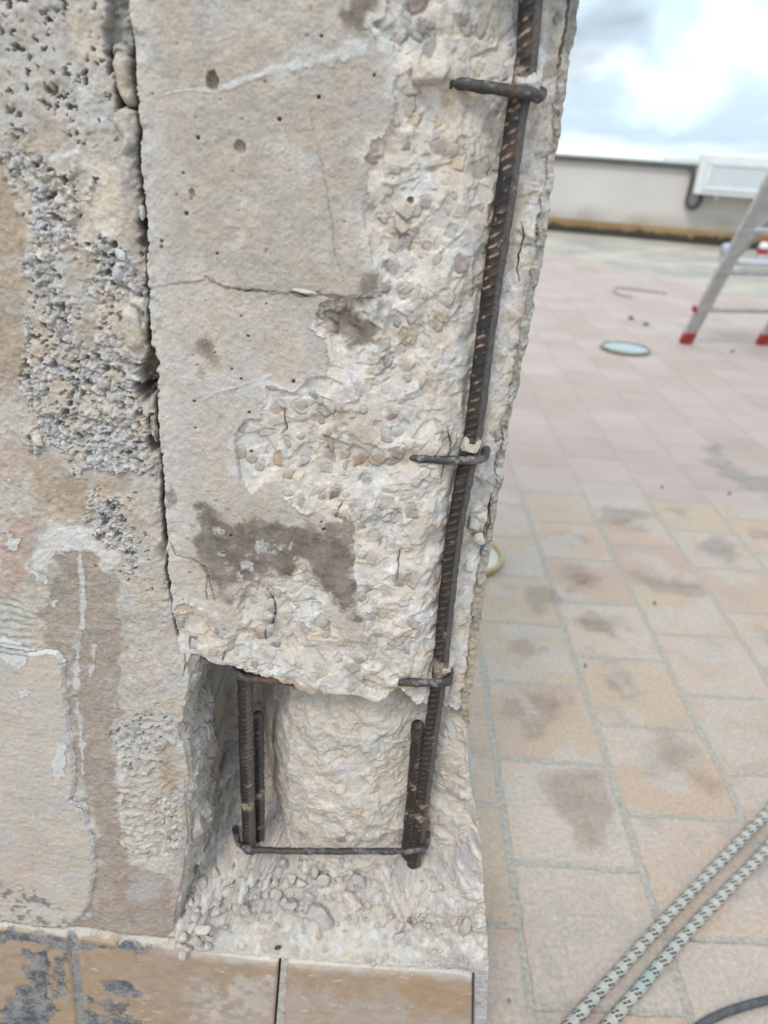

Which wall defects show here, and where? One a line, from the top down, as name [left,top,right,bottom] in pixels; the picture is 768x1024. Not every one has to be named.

crack [106,0,139,109]
crack [141,218,150,247]
crack [208,118,380,299]
crack [136,310,161,450]
spalling [172,0,571,879]
leakage [194,503,363,622]